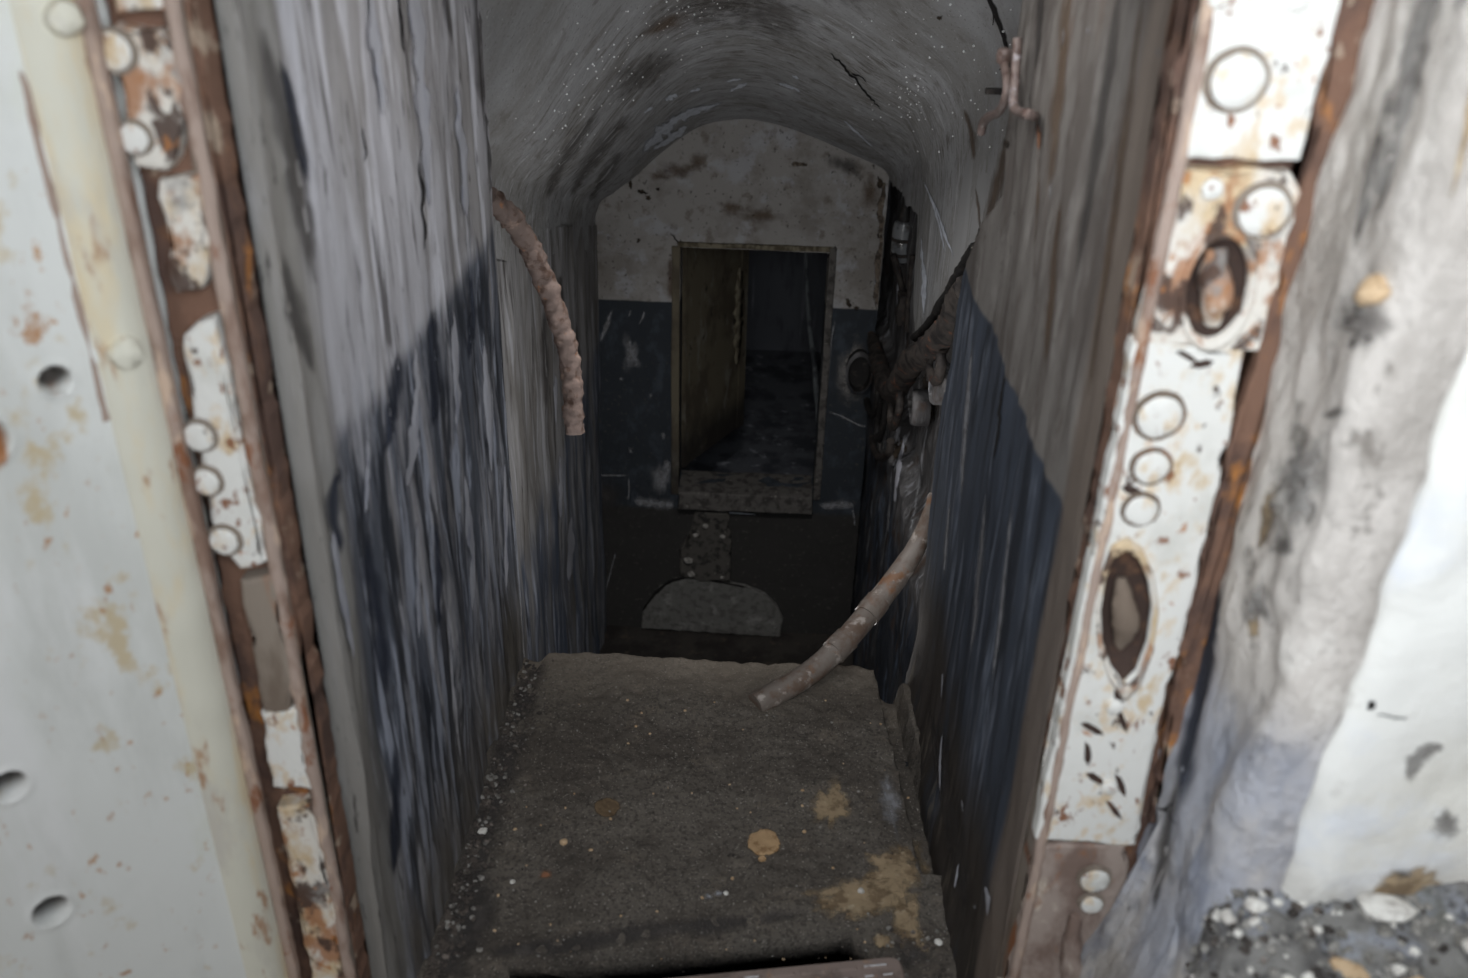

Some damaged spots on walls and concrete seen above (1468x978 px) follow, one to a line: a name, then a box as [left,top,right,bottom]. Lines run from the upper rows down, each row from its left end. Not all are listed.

crack [829,52,880,109]
water stain [814,784,848,823]
water stain [748,829,780,862]
water stain [806,845,928,960]
water stain [499,916,779,954]